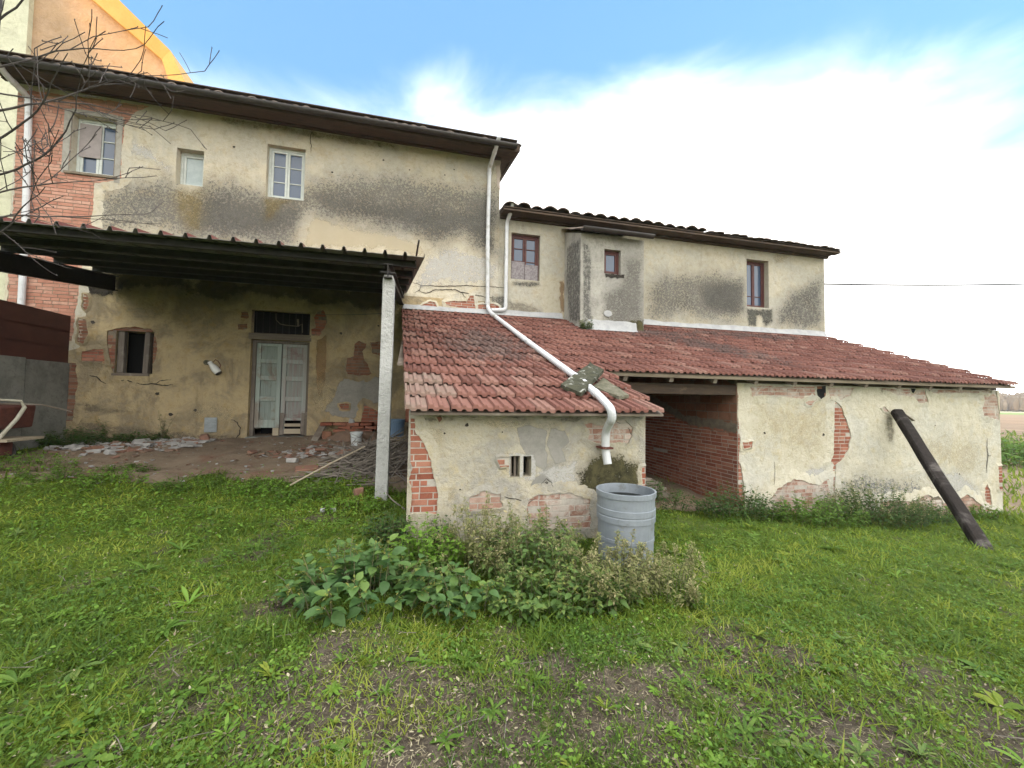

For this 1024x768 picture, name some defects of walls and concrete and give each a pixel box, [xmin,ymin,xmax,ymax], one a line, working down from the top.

flaking render [14,253,92,270]
flaking render [10,84,158,229]
flaking render [4,273,168,427]
water stain [102,144,505,287]
flaking render [310,306,381,432]
crack [412,282,504,298]
spalling [420,292,501,313]
flaking render [406,376,856,541]
water stain [566,239,824,330]
spalling [879,388,1000,426]